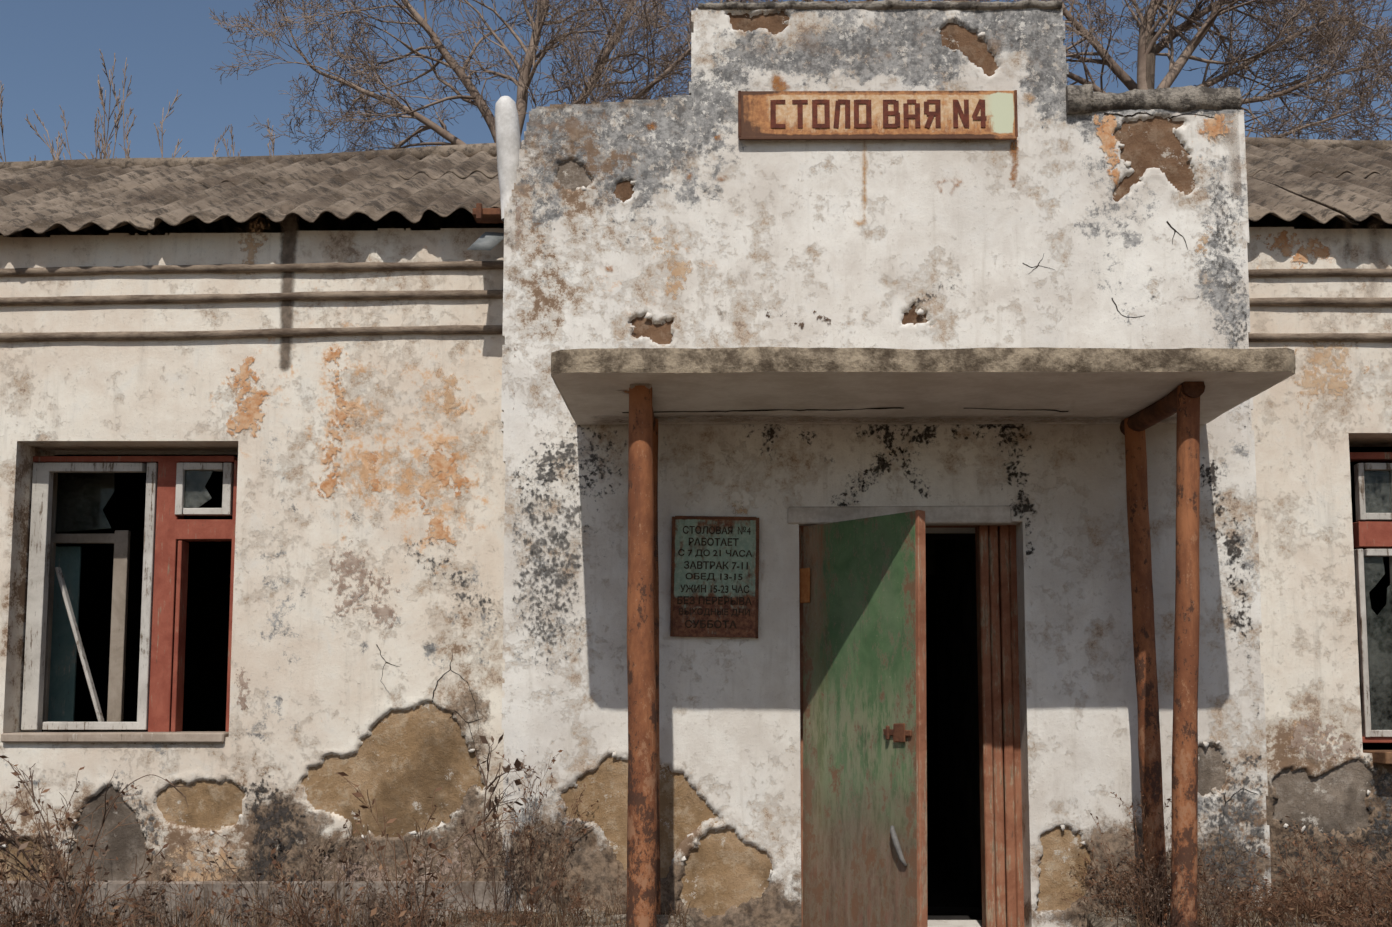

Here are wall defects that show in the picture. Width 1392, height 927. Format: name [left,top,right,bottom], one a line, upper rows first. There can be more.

flaking render [726,11,790,34]
flaking render [940,23,999,76]
flaking render [1093,114,1234,202]
flaking render [630,312,673,344]
water stain [405,539,497,626]
water stain [512,419,626,675]
water stain [655,416,1124,567]
mould [1200,460,1253,639]
flaking render [70,780,245,881]
flaking render [301,701,487,881]
flaking render [561,751,628,871]
flaking render [659,763,774,917]